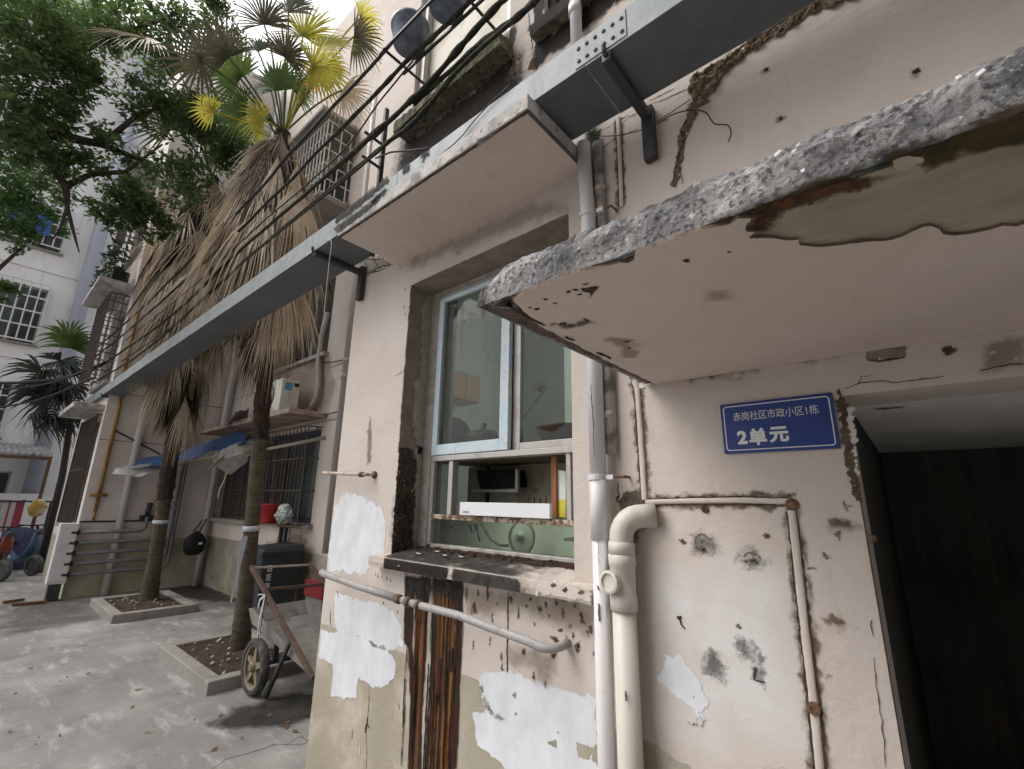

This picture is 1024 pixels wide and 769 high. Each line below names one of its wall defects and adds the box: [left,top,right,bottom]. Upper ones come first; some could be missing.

spalling [649,0,851,188]
flaking render [710,103,1024,244]
peeling [566,283,599,298]
spalling [488,298,651,396]
crack [845,375,943,389]
flaking render [834,389,906,769]
damp [465,587,592,673]